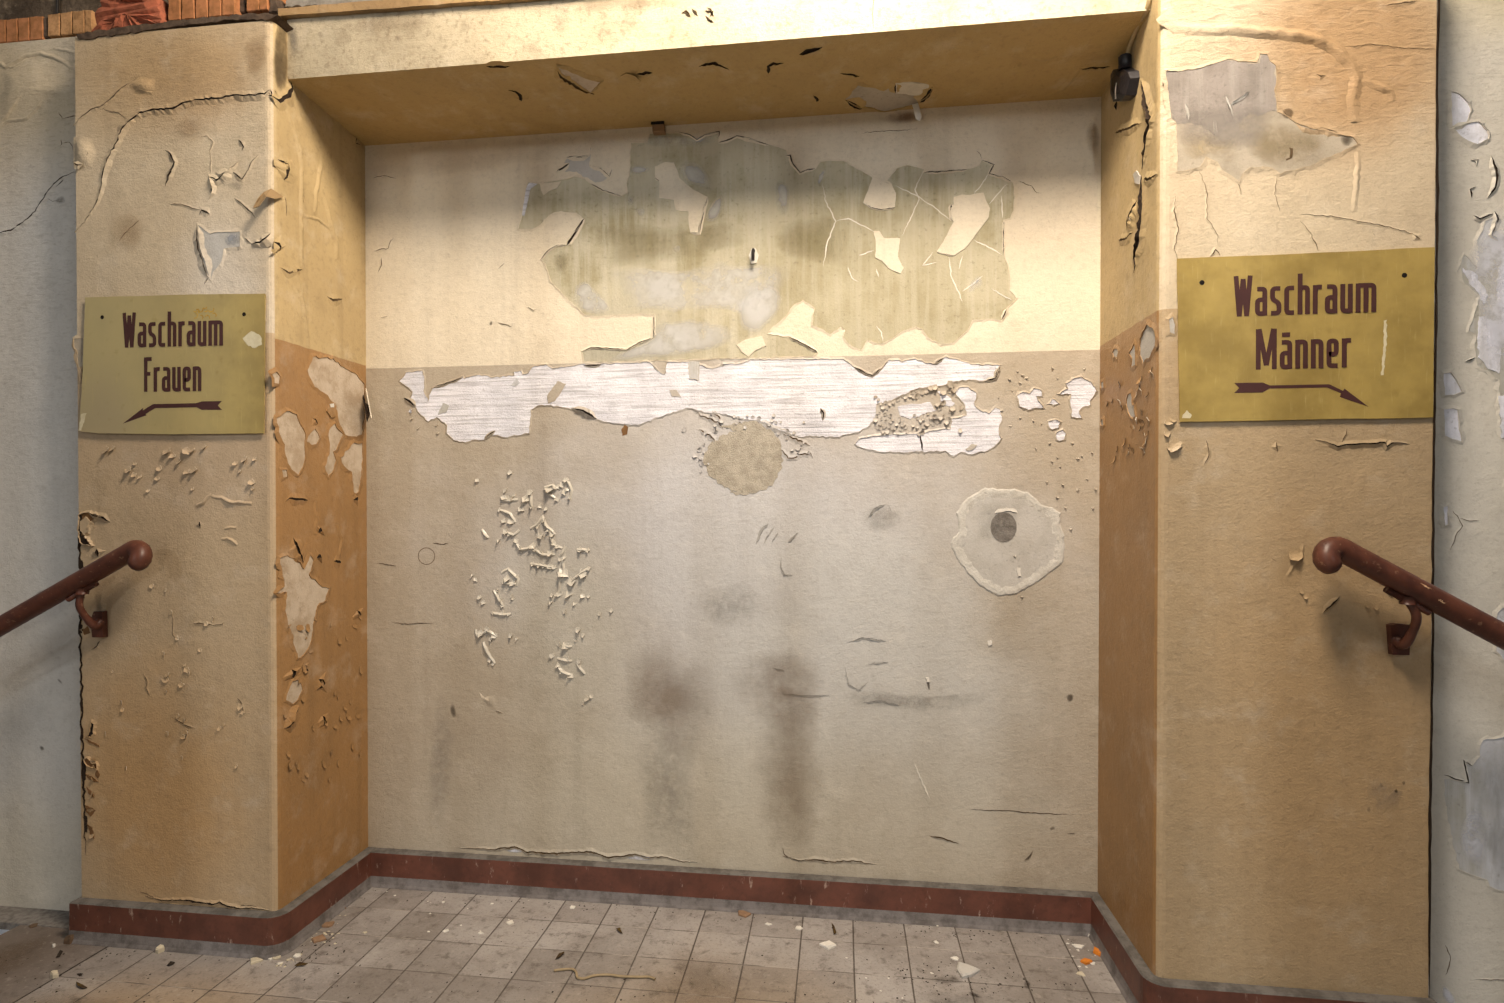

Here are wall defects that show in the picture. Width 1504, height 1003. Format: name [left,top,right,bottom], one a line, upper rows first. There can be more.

crack [0,78,296,236]
peeling [841,78,940,121]
peeling [1162,51,1361,185]
peeling [398,130,1178,495]
peeling [1437,89,1504,445]
crack [77,515,88,570]
peeling [273,551,331,733]
spalling [951,488,1065,596]
crack [1080,0,1504,998]
peeling [1492,602,1504,622]
crack [78,615,87,853]
peeling [1439,731,1504,893]